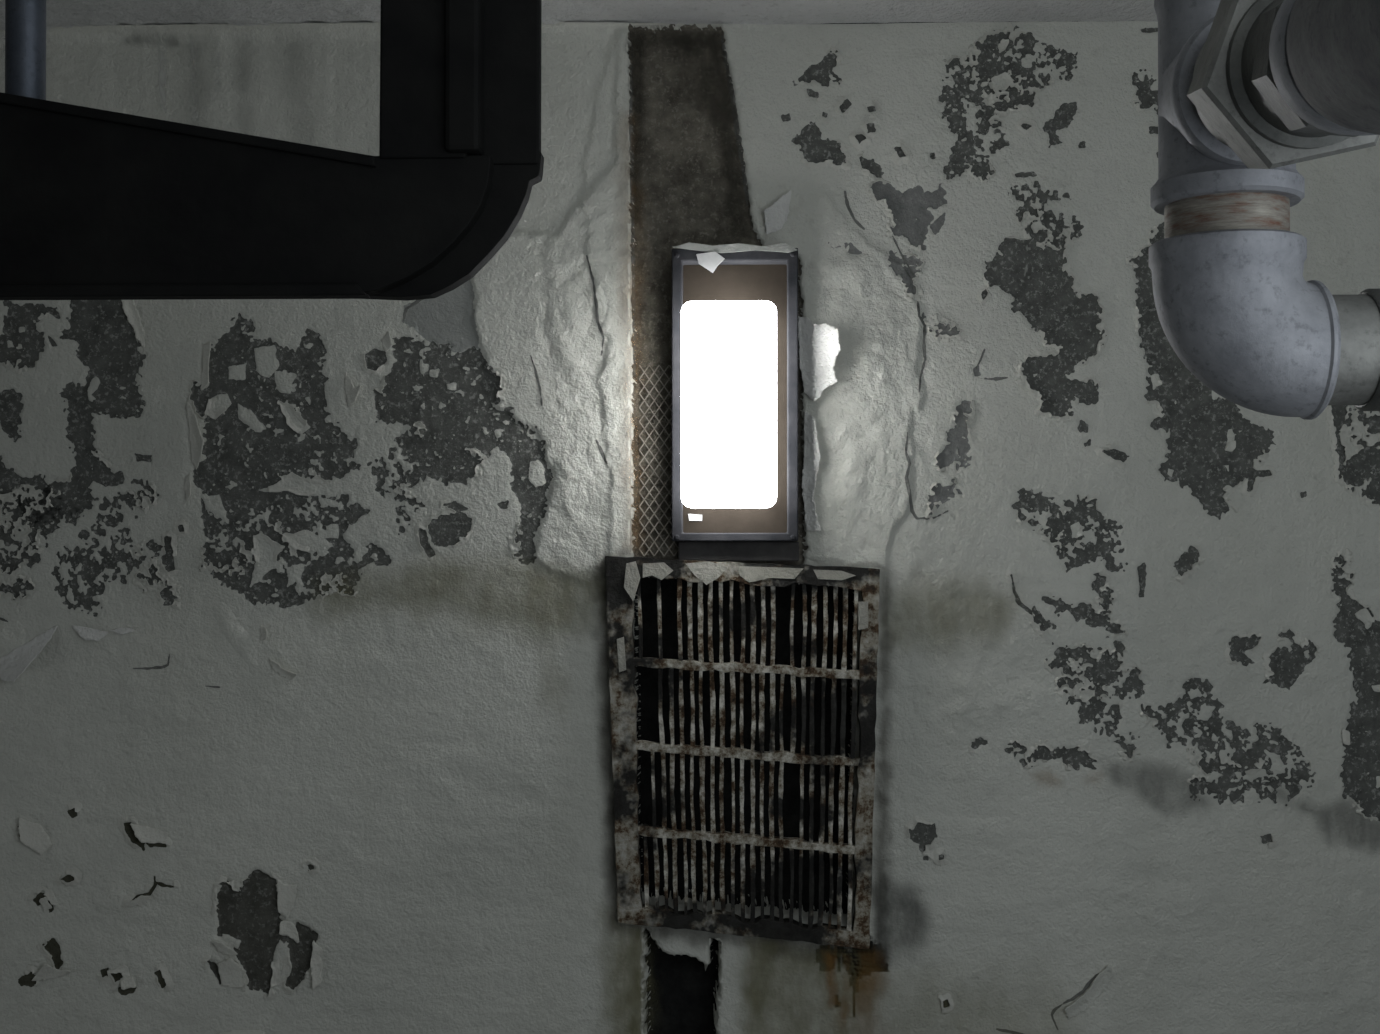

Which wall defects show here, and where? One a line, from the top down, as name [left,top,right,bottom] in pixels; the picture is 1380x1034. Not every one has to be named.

peeling [0,280,554,617]
crack [844,191,927,392]
crack [905,432,948,520]
peeling [781,23,1086,345]
peeling [925,400,976,521]
peeling [977,171,1129,468]
peeling [1126,222,1277,520]
peeling [1325,405,1380,508]
peeling [1004,488,1316,806]
peeling [1224,549,1380,822]
spalling [201,869,323,1001]
spalling [645,930,720,1034]